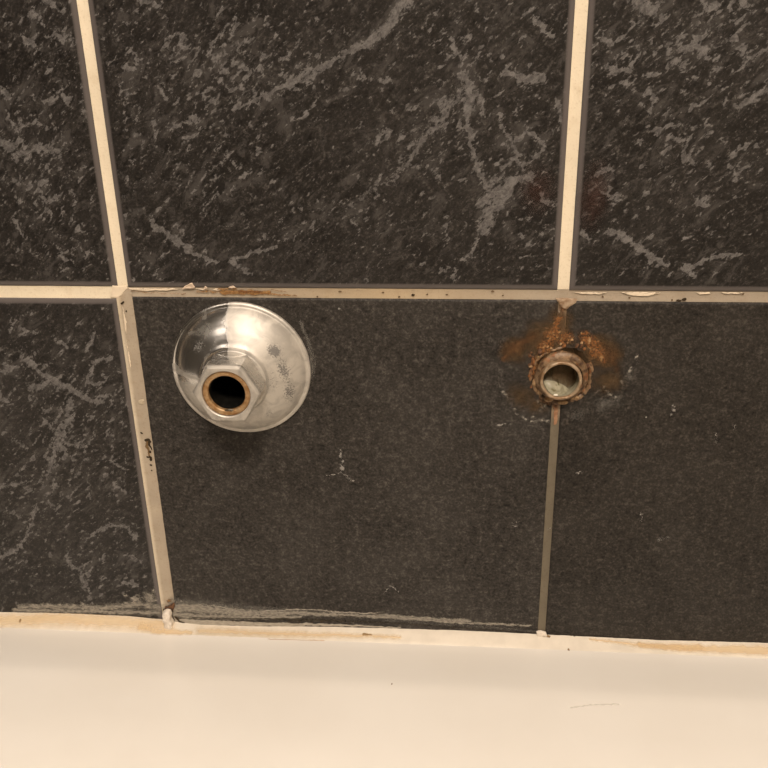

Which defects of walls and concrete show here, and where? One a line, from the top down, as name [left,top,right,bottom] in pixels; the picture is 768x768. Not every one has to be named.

rust [197,288,297,296]
rust [502,308,621,425]